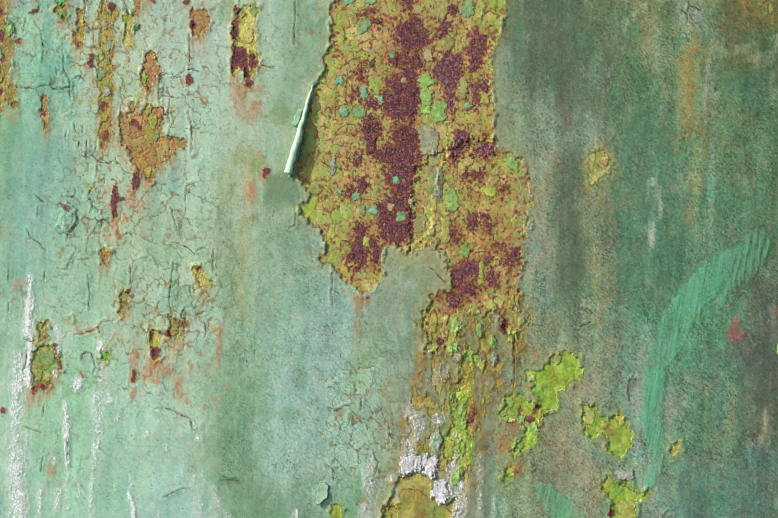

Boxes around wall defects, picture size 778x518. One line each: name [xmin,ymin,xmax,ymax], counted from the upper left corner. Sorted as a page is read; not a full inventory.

peeling [0,0,19,113]
crack [21,1,109,278]
peeling [96,0,187,183]
crack [158,46,197,149]
peeling [230,4,260,89]
crack [165,266,207,335]
peeling [296,0,584,518]
peeling [30,320,61,394]
peeling [581,403,633,458]
peeling [600,468,650,518]